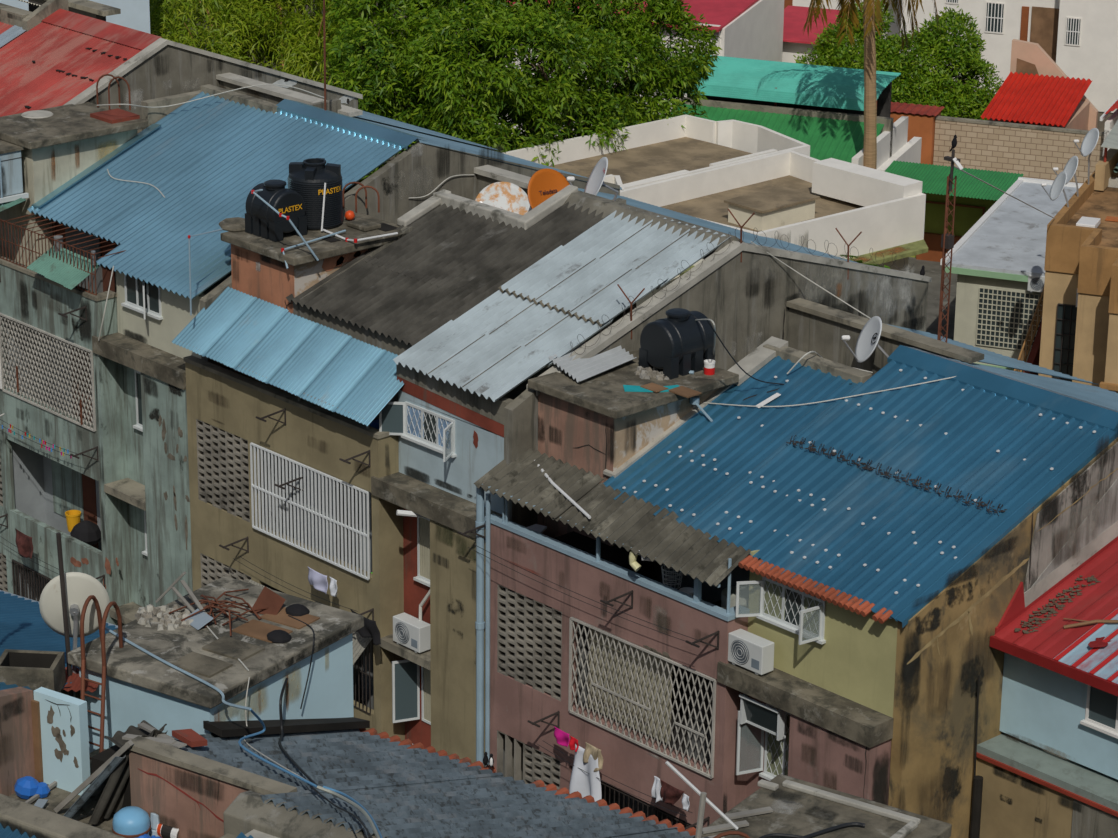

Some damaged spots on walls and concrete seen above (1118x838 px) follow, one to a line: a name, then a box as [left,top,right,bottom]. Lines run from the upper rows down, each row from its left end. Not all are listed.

damp [21,283,37,317]
damp [59,302,91,340]
damp [125,330,145,343]
damp [144,377,182,421]
damp [1042,438,1109,555]
damp [903,564,978,707]
damp [944,641,991,697]
damp [939,767,961,812]
damp [994,766,1043,794]
damp [1061,797,1081,812]